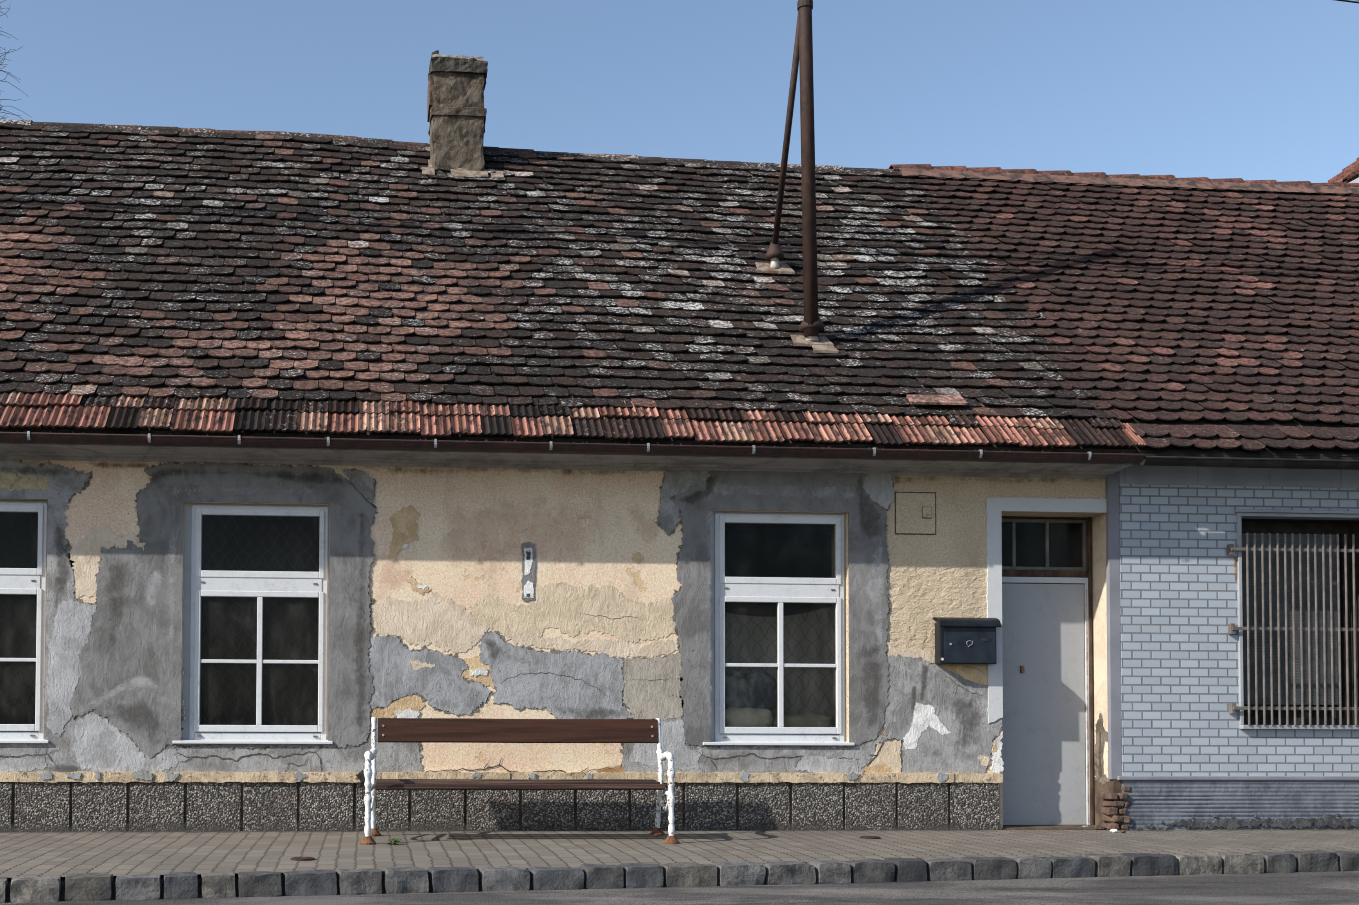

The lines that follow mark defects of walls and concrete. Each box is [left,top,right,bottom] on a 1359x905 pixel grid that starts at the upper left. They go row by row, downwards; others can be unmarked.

peeling [0,459,1004,783]